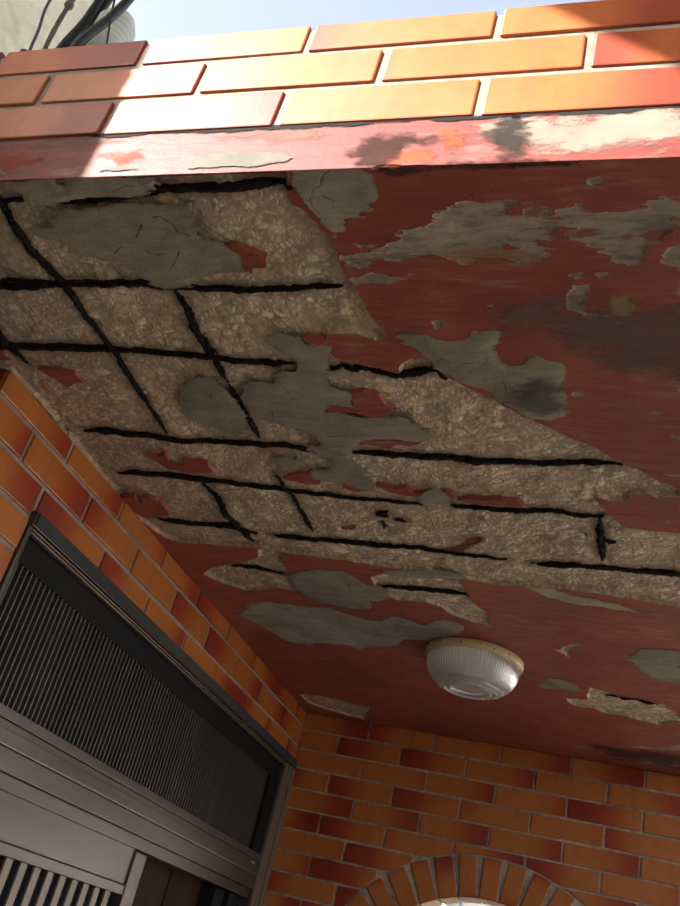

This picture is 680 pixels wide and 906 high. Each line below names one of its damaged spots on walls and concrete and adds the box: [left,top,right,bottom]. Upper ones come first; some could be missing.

damp [91,119,410,138]
peeling [218,128,322,142]
damp [348,105,680,176]
peeling [477,106,680,154]
peeling [112,151,141,163]
peeling [384,149,435,166]
crack [375,161,454,169]
crack [115,216,189,268]
spalling [0,170,680,626]
spalling [566,688,680,751]
damp [592,745,680,768]